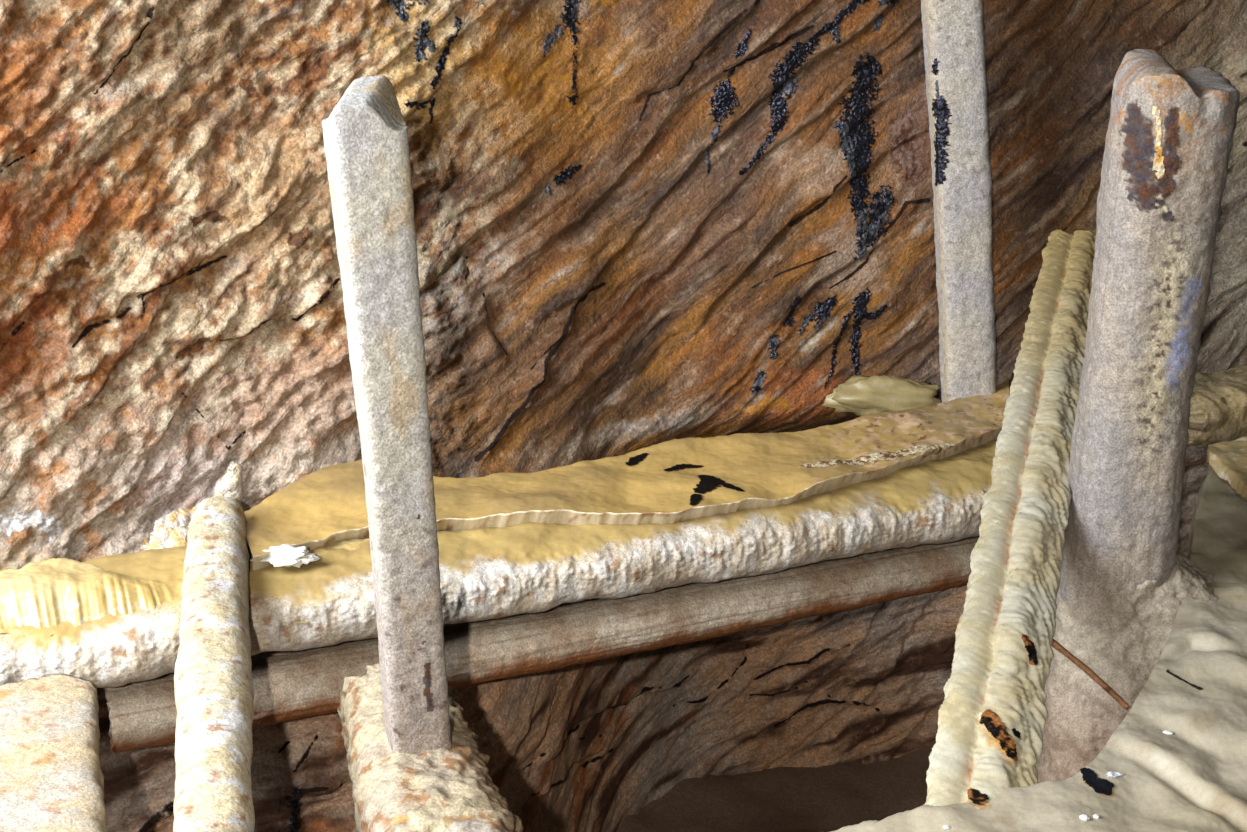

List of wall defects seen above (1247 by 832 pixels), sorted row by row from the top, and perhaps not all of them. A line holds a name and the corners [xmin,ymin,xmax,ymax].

leakage [493,0,581,105]
leakage [705,29,751,174]
leakage [738,0,900,175]
leakage [833,52,895,260]
leakage [931,58,952,186]
crack [71,255,227,348]
crack [465,256,606,462]
leakage [747,288,888,409]
crack [523,644,880,797]